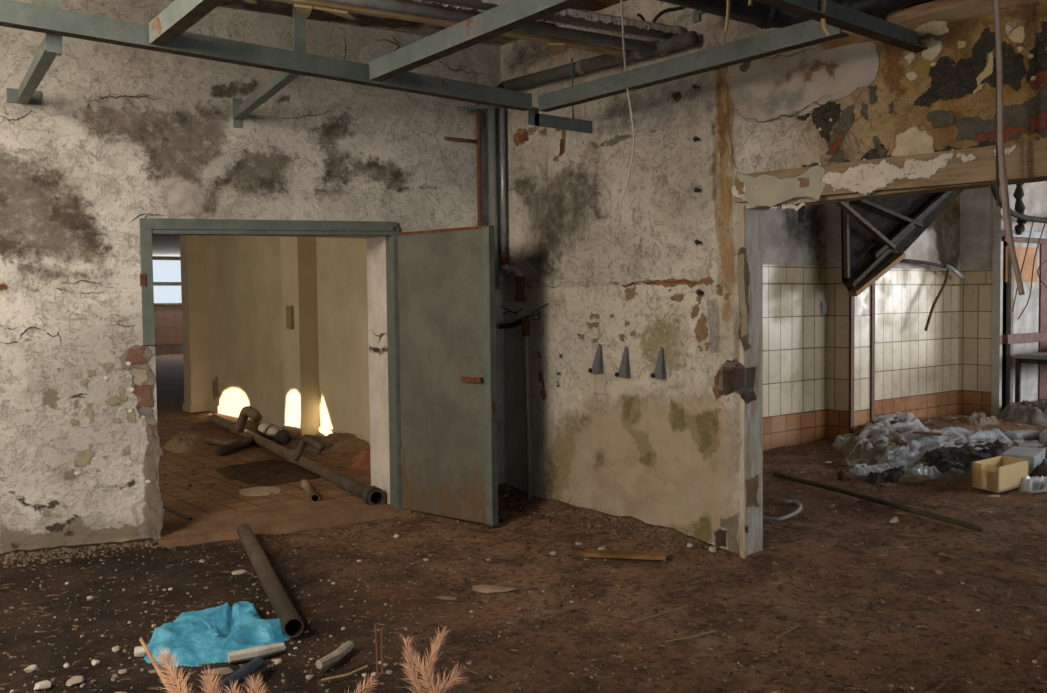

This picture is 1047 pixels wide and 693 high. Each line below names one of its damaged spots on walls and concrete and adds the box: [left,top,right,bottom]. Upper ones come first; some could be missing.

crack [86,94,172,109]
leakage [86,80,291,211]
leakage [315,113,409,193]
peeling [731,21,1047,211]
leakage [0,155,110,279]
leakage [521,171,599,267]
peeling [577,313,636,343]
corrosion [612,278,714,288]
peeling [656,247,757,404]
flaking render [81,345,165,539]
leakage [545,396,733,536]
peeling [746,474,759,507]